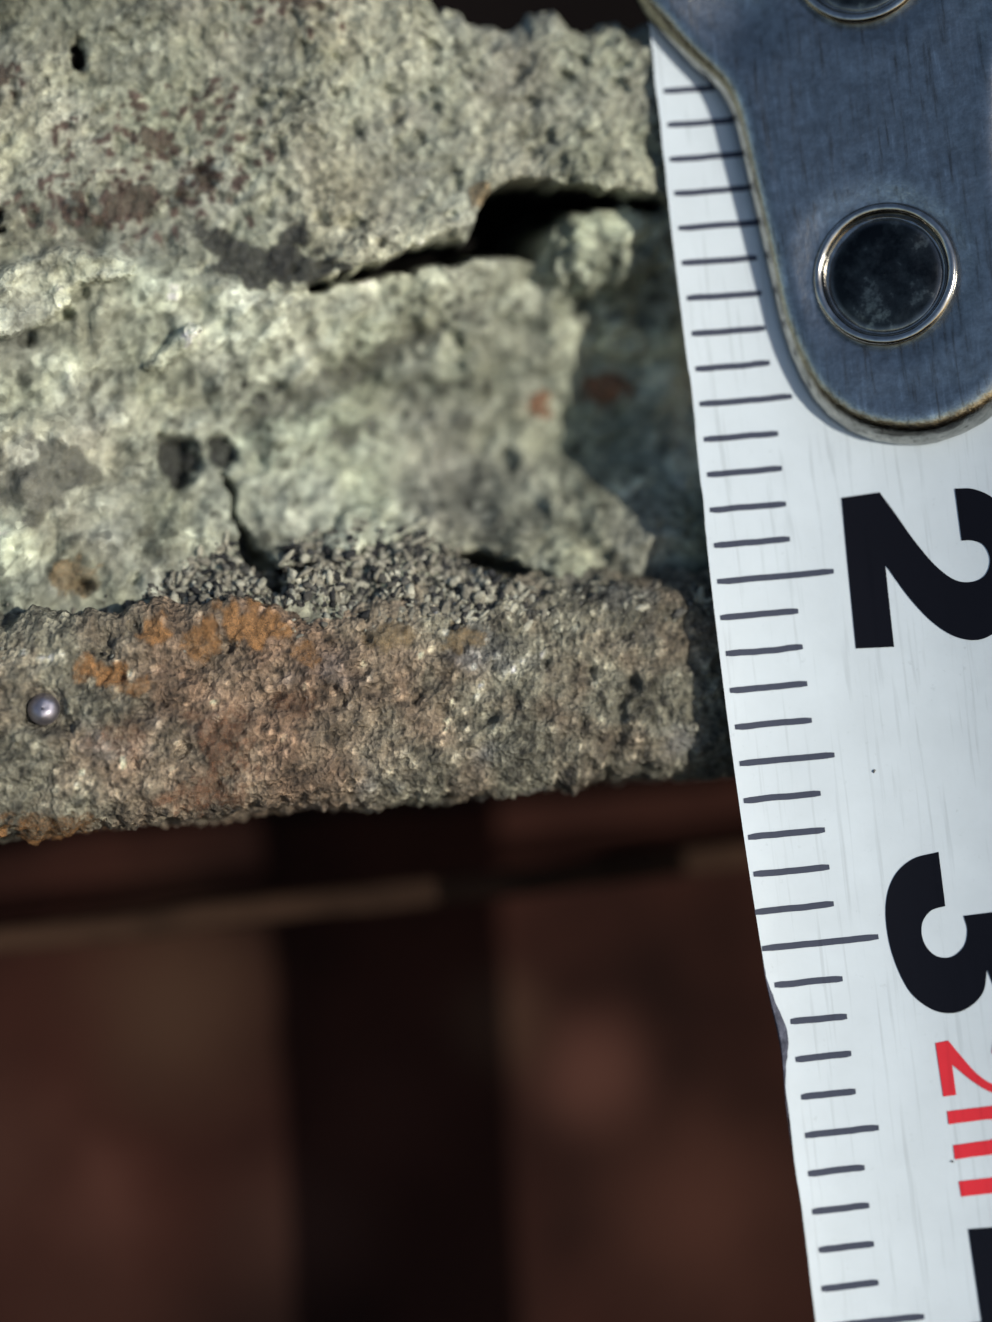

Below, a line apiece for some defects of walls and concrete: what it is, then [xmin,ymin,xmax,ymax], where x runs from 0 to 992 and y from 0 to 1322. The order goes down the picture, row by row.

crack [308,185,661,293]
rust [187,598,294,659]
rust [80,655,127,686]